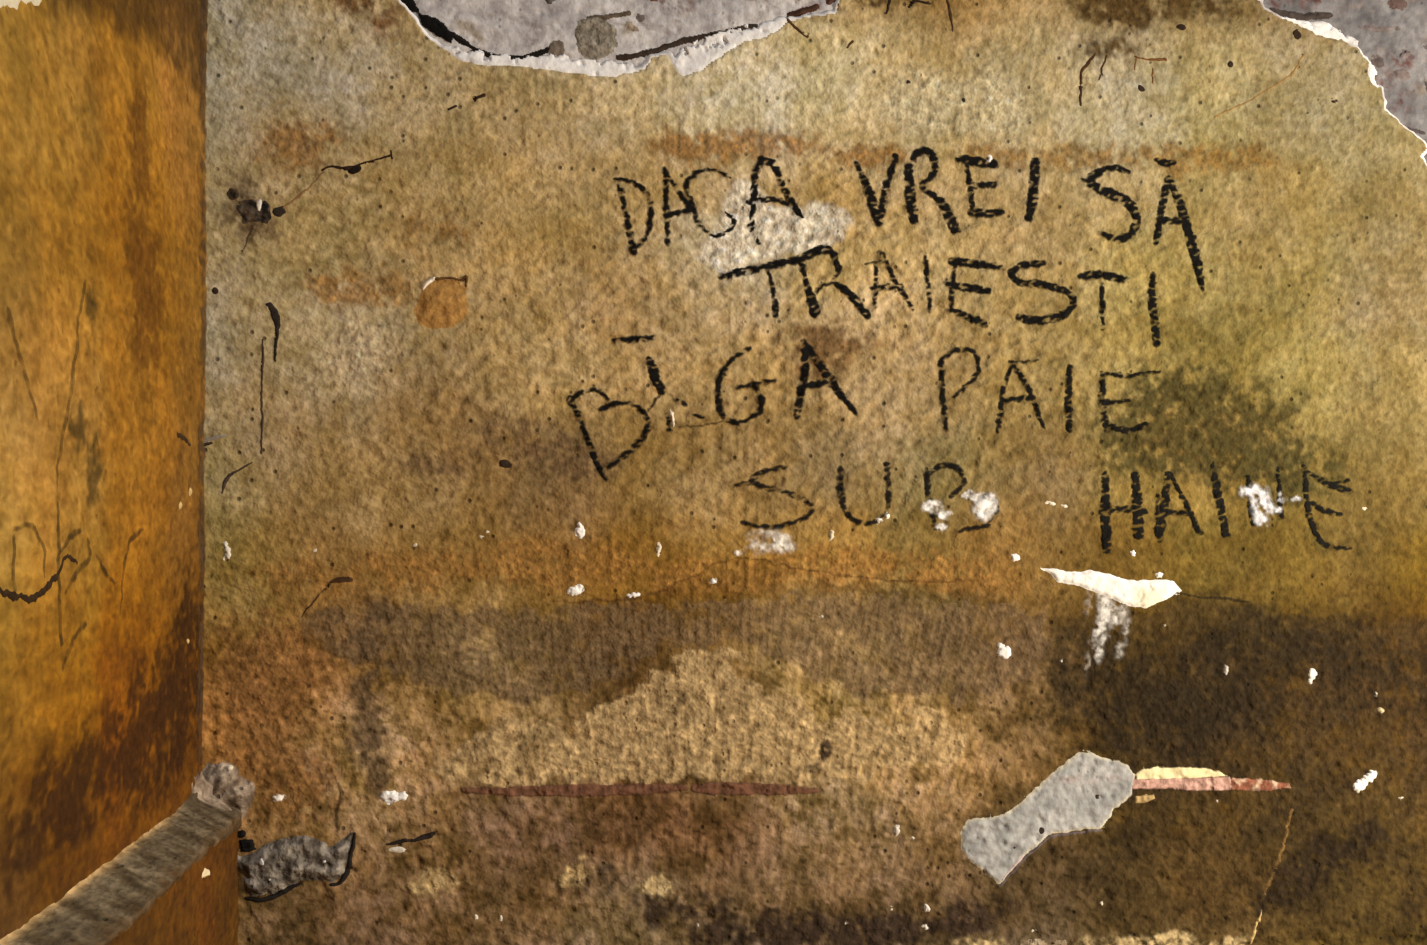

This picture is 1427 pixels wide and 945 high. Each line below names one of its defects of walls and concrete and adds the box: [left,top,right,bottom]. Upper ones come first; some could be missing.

peeling [0,0,42,10]
peeling [398,0,840,77]
peeling [1258,0,1427,166]
damp [70,409,102,500]
crack [0,554,78,604]
peeling [1041,568,1248,667]
damp [4,584,200,884]
damp [351,604,389,797]
spalling [237,791,356,903]
spalling [960,750,1136,887]
damp [1251,823,1390,916]